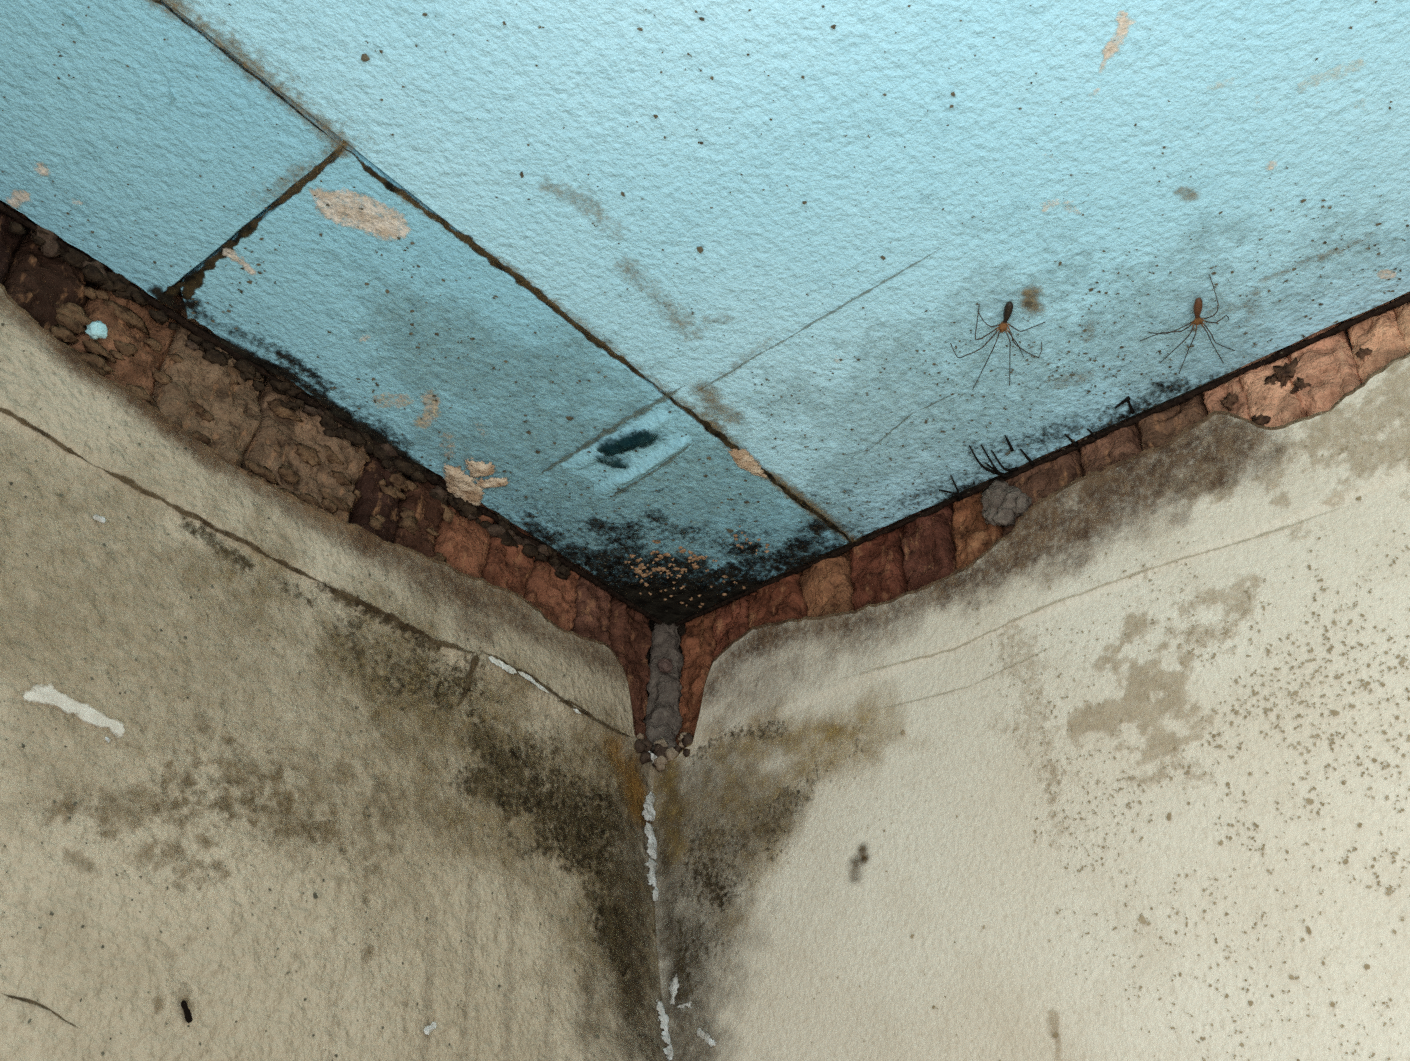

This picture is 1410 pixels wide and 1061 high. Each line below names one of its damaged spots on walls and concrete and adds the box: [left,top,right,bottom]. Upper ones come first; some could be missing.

crack [0,408,633,738]
water stain [0,293,866,1061]
crack [0,0,1410,626]
flaking render [0,189,1410,783]
water stain [148,166,1410,625]
water stain [708,415,1410,1061]